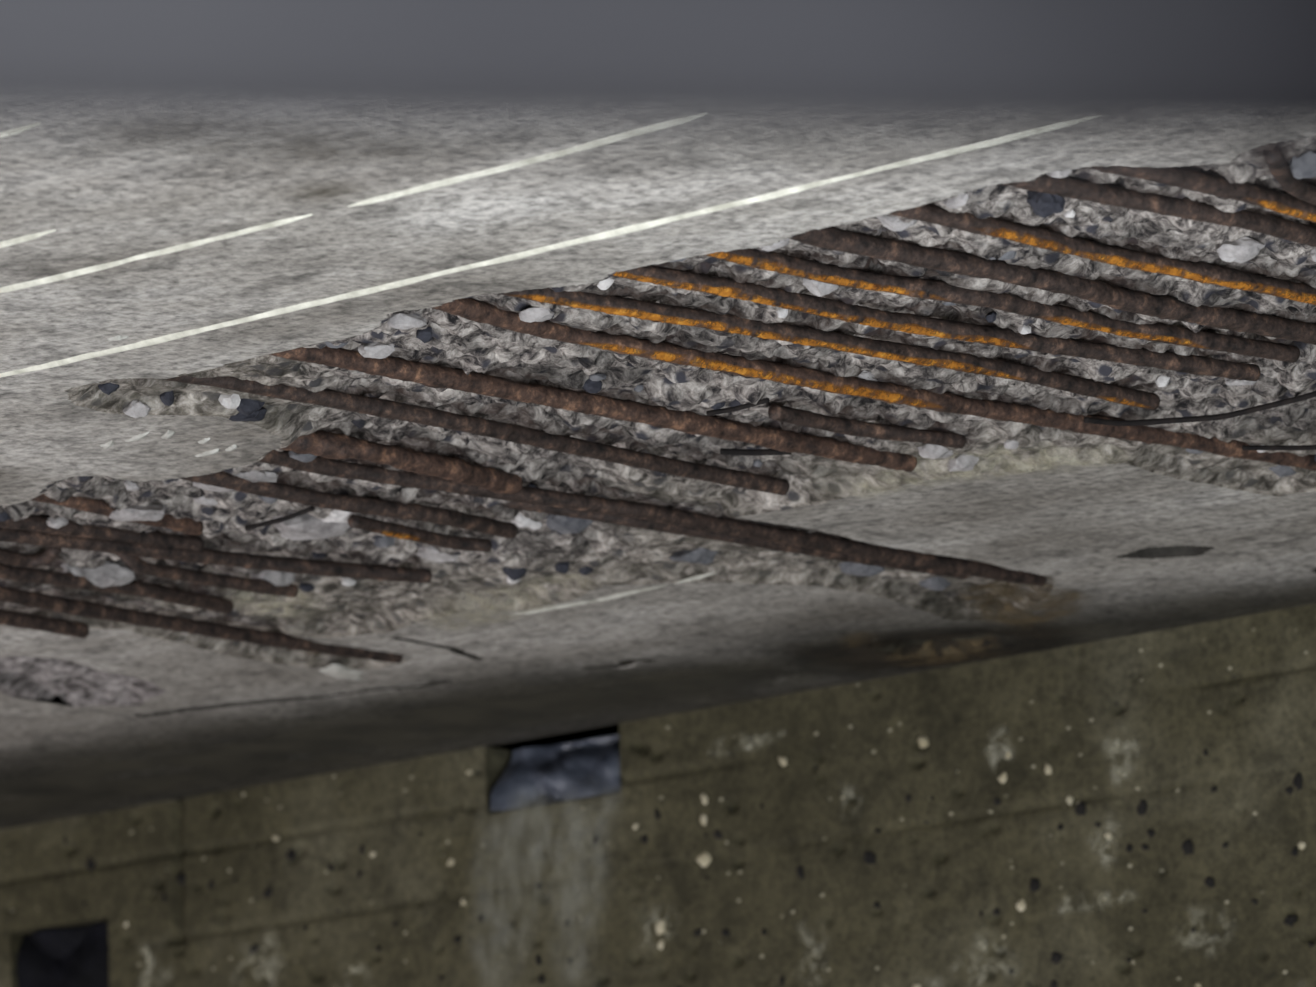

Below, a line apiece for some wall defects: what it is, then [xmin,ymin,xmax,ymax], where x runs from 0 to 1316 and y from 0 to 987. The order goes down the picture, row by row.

spalling [0,655,168,707]
spalling [0,152,1316,681]